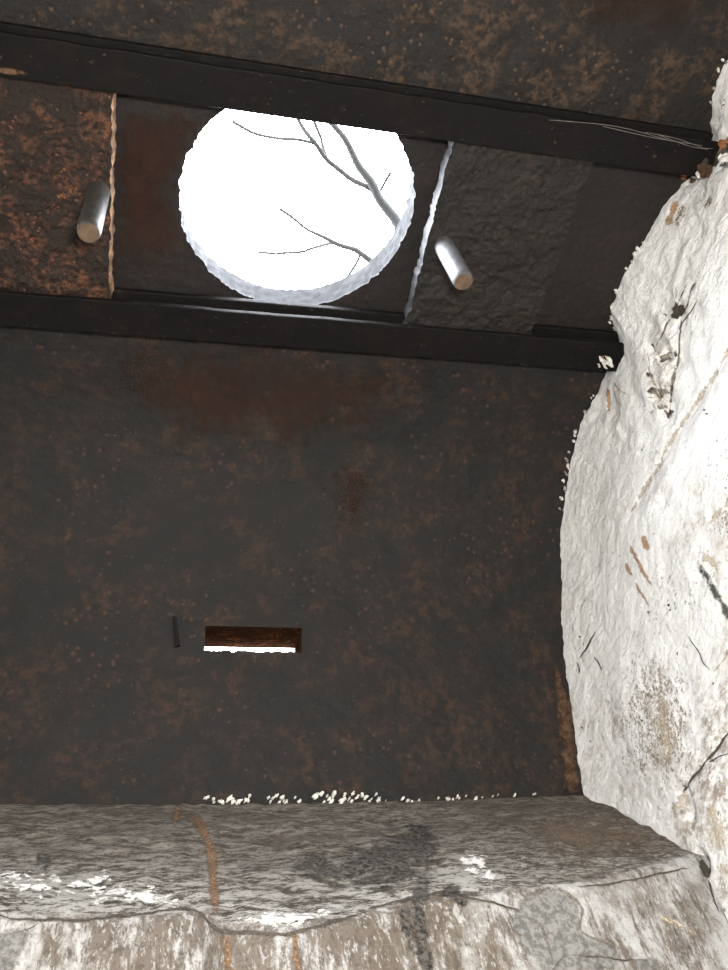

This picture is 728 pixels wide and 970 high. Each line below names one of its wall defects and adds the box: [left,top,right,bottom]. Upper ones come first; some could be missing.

crack [683,733,728,792]
rust [172,805,220,913]